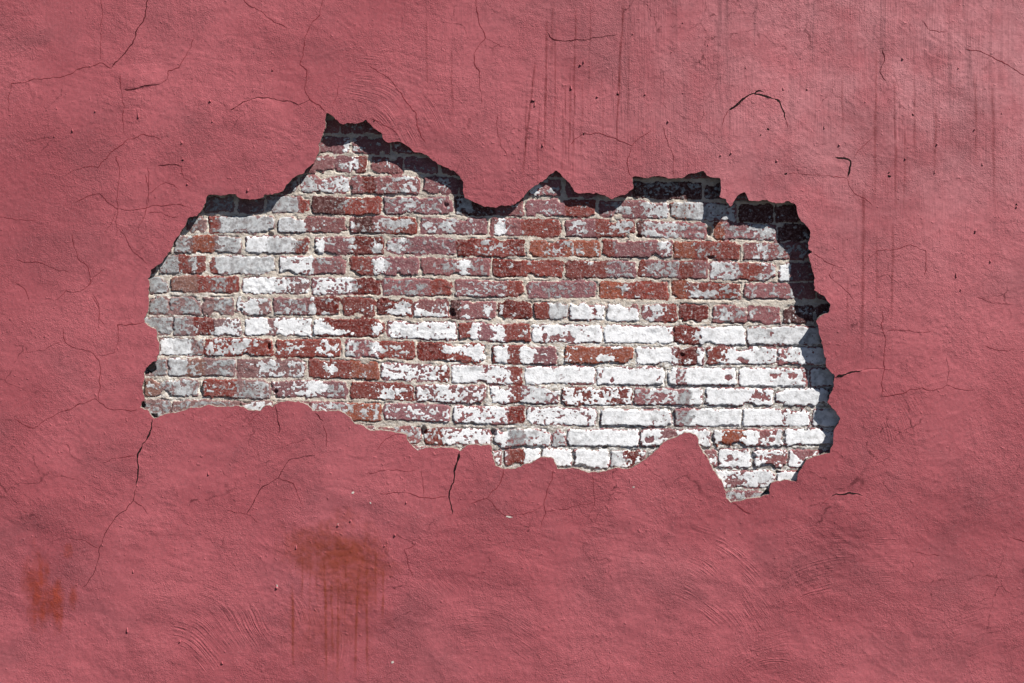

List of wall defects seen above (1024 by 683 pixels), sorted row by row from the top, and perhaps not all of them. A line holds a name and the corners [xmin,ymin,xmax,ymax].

crack [8,0,195,263]
crack [231,0,339,110]
crack [722,90,788,127]
crack [18,235,153,587]
crack [370,434,595,525]
spalling [141,113,840,502]